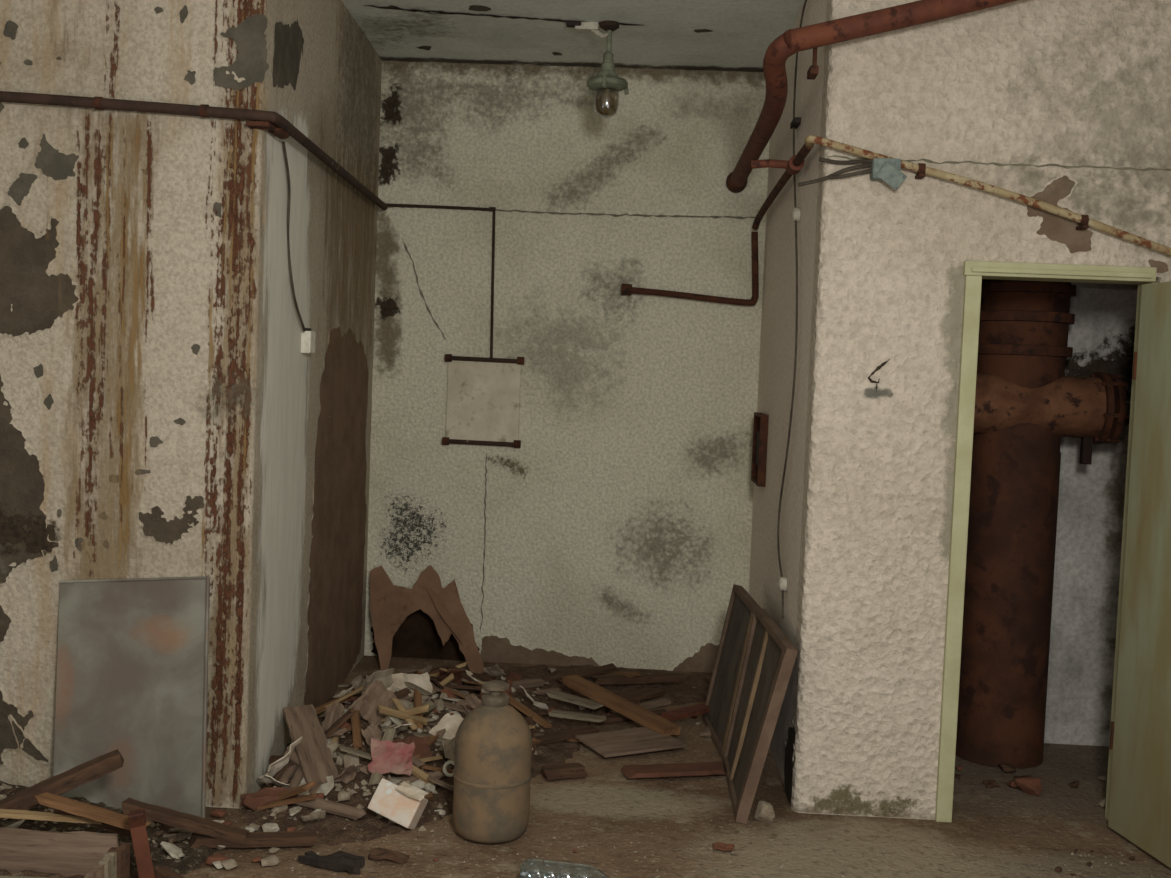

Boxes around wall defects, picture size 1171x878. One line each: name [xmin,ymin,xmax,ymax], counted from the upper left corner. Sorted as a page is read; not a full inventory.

rust [104,2,120,99]
rust [213,0,265,65]
spalling [213,14,304,91]
spalling [0,118,84,346]
crack [480,209,755,219]
crack [904,159,1171,171]
crack [401,237,445,339]
rust [67,112,154,580]
rust [202,82,265,807]
spalling [0,370,109,648]
spalling [303,322,466,708]
damp [379,482,448,585]